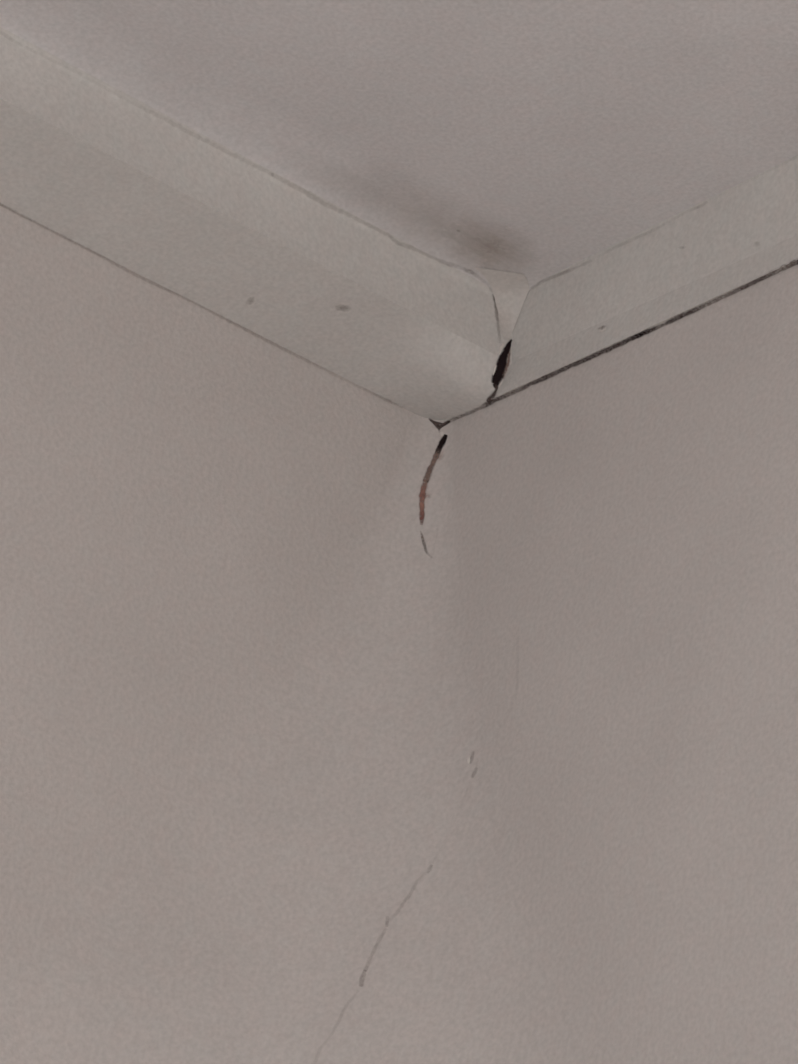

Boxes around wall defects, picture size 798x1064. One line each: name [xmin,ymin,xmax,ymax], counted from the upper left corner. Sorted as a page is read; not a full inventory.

crack [419,260,798,549]